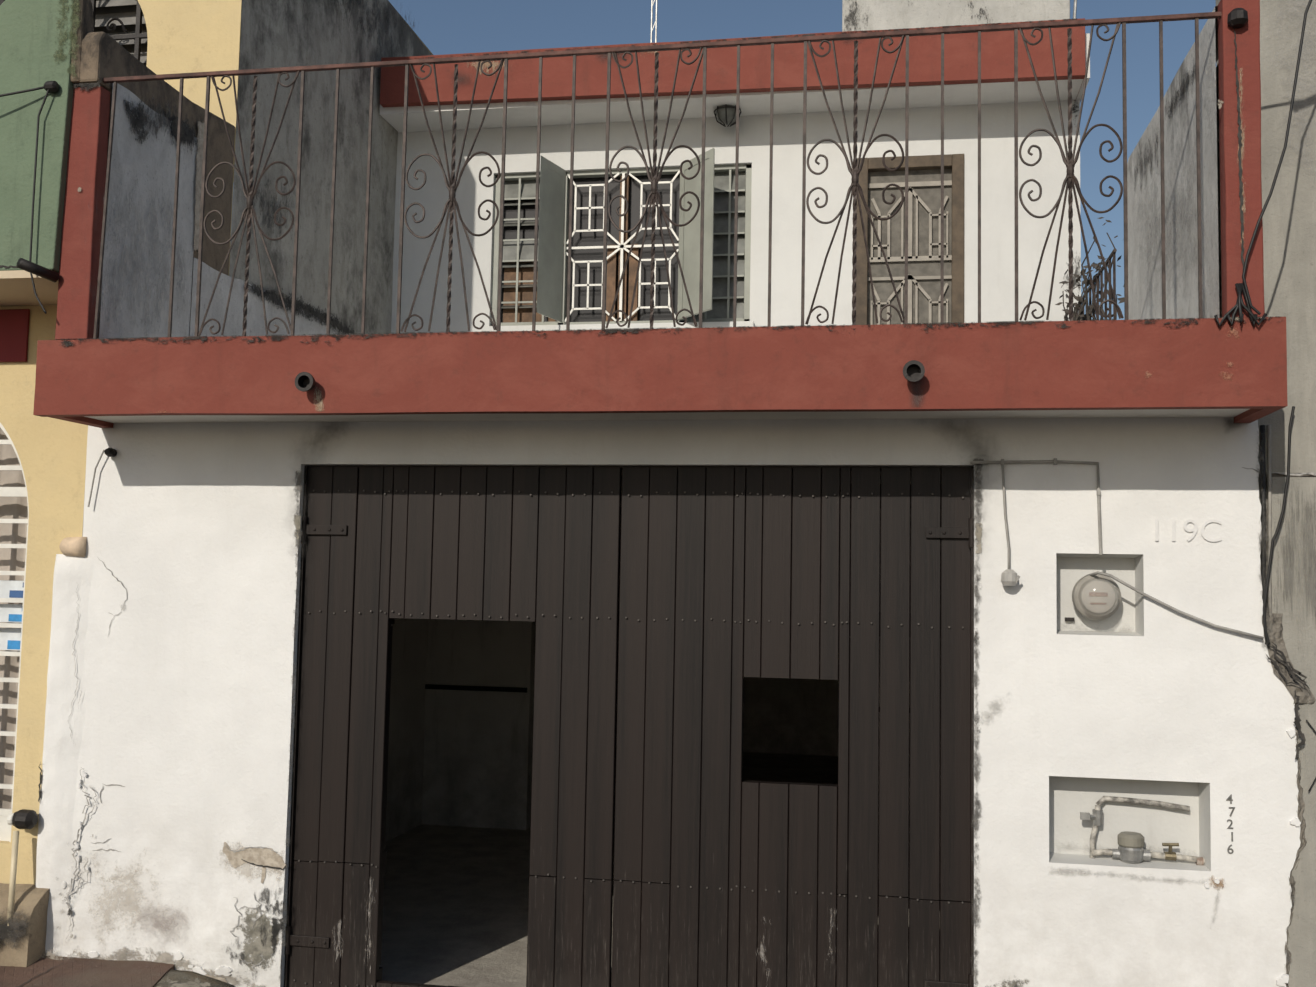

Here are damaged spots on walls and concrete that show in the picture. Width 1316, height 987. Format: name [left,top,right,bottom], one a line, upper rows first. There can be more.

leakage [125,98,202,150]
crack [98,558,127,635]
leakage [972,567,981,864]
crack [16,582,125,987]
spalling [1262,613,1316,987]
flaking render [222,842,288,883]
leakage [0,912,28,947]
leakage [226,889,287,976]
leakage [972,881,980,984]